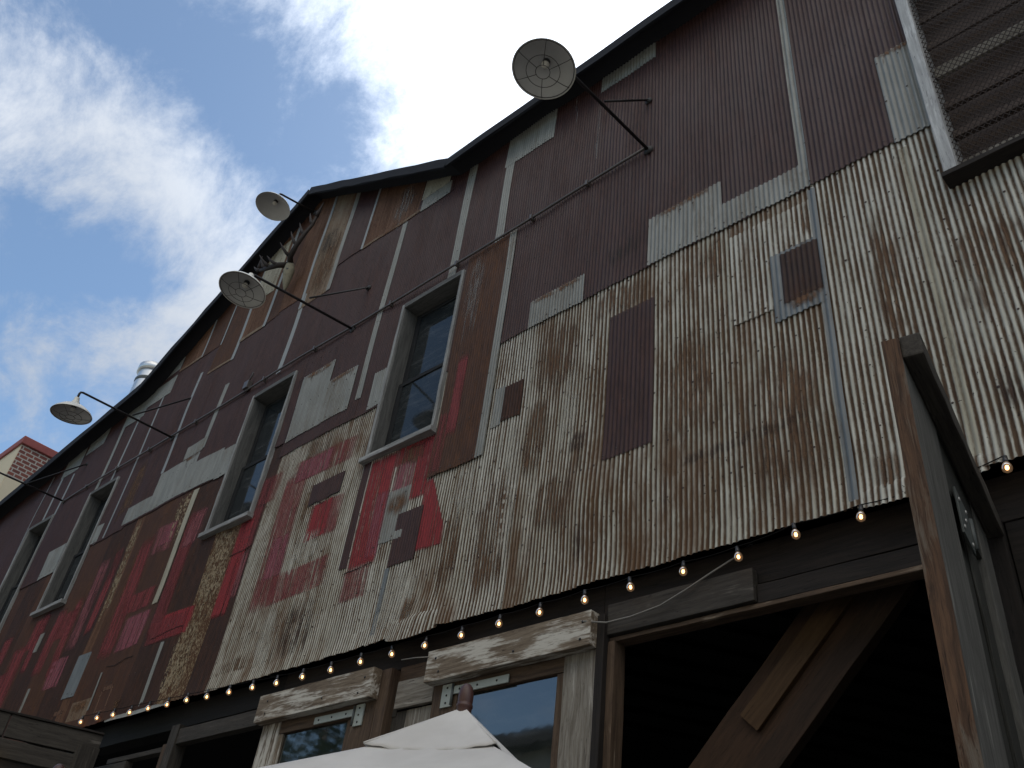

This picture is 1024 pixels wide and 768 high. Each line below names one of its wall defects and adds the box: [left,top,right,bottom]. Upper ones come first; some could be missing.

corrosion [701,238,724,285]
corrosion [870,217,917,339]
corrosion [960,221,1024,306]
corrosion [523,326,574,472]
corrosion [665,333,717,440]
corrosion [686,352,831,497]
corrosion [999,375,1023,400]
corrosion [535,471,570,527]